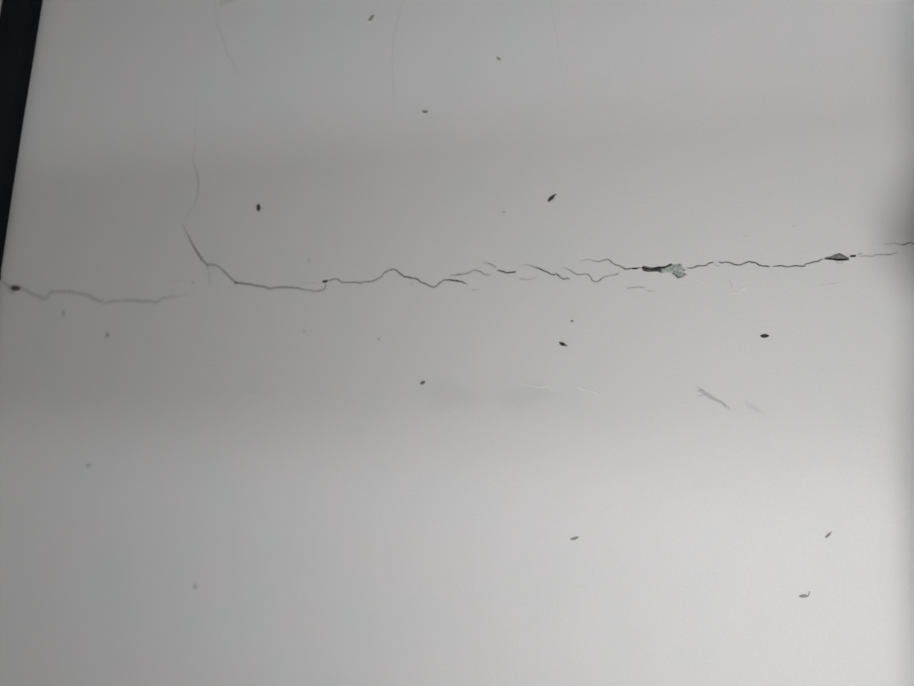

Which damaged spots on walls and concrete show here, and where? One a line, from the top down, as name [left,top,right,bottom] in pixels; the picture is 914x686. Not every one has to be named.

crack [498,259,639,281]
crack [690,259,822,269]